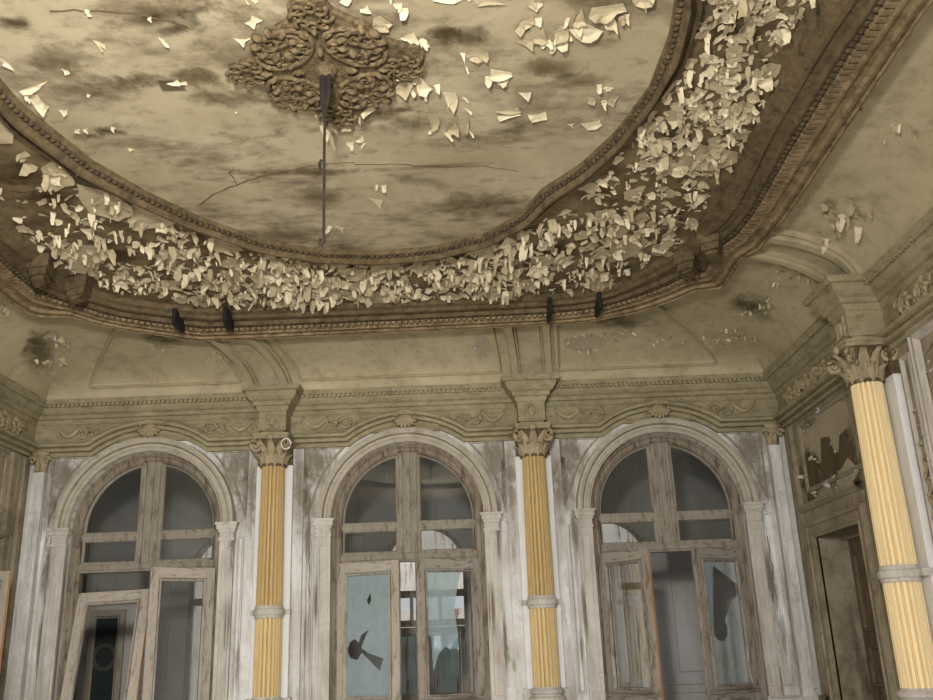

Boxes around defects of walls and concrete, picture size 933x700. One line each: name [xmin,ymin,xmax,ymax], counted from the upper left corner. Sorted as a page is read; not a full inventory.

damp [2,19,28,27]
damp [134,6,193,32]
damp [179,72,212,81]
peeling [0,121,14,144]
peeling [13,0,816,314]
damp [0,169,38,183]
damp [30,194,68,205]
crack [197,162,518,207]
peeling [812,198,873,254]
peeling [34,335,71,370]
spalling [801,401,849,464]
spalling [811,458,859,498]